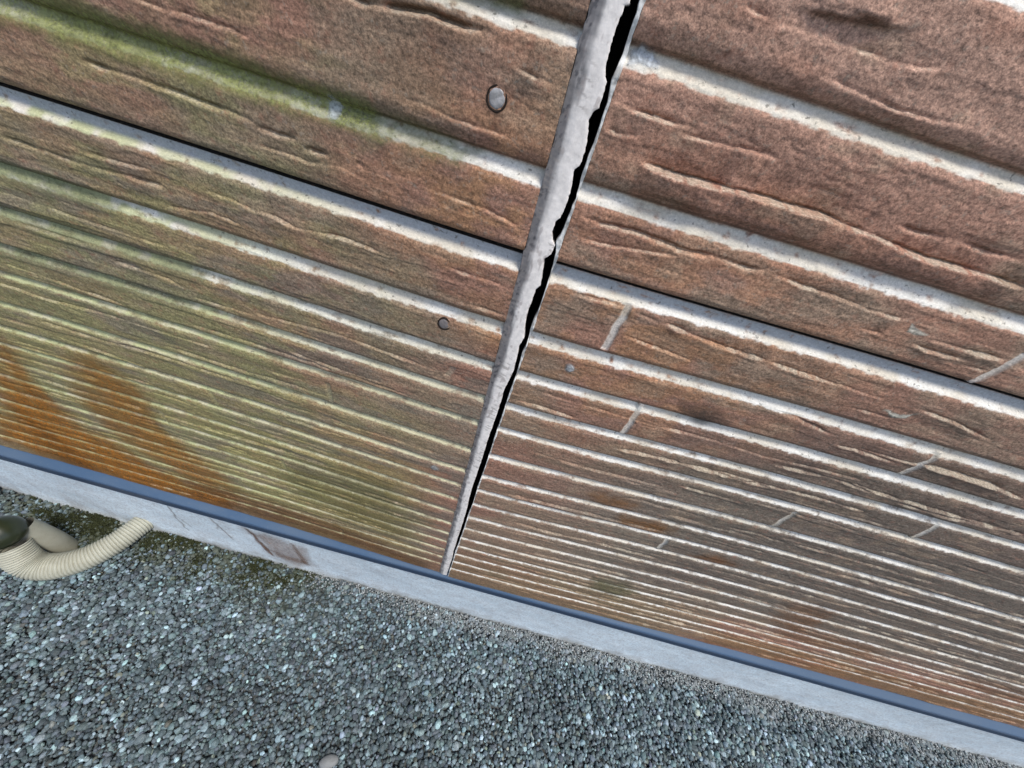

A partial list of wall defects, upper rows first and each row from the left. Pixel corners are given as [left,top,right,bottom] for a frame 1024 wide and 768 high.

rust [0,352,236,504]
crack [448,0,646,575]